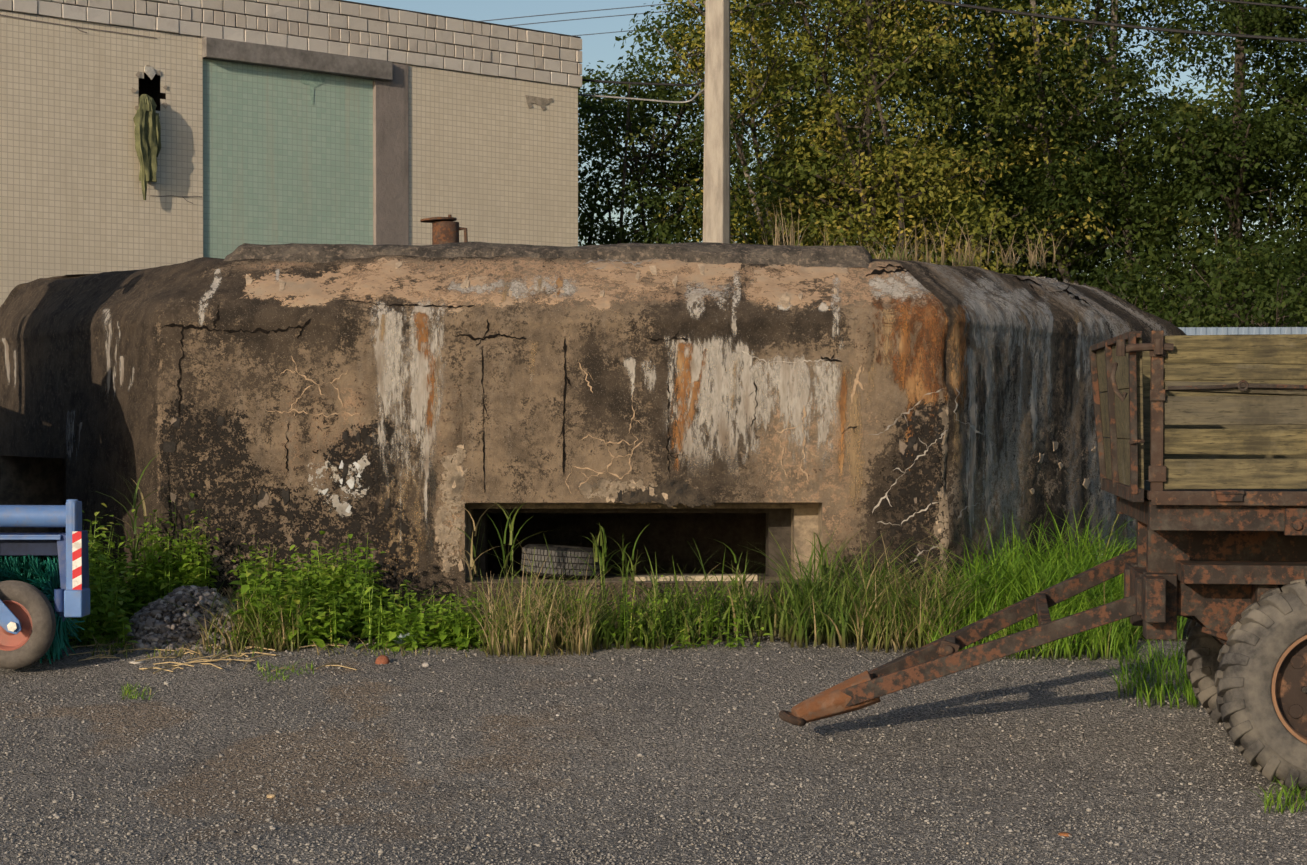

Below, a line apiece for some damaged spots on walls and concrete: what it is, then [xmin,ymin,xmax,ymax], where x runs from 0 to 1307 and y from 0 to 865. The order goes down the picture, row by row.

spalling [131,65,168,120]
peeling [158,399,419,601]
leakage [371,287,463,576]
rust [414,312,438,432]
crack [342,297,526,493]
spalling [433,444,468,573]
crack [559,339,680,493]
rust [669,342,704,469]
leakage [623,274,843,462]
crack [739,347,985,563]
rust [838,293,971,506]
leakage [964,285,1053,540]